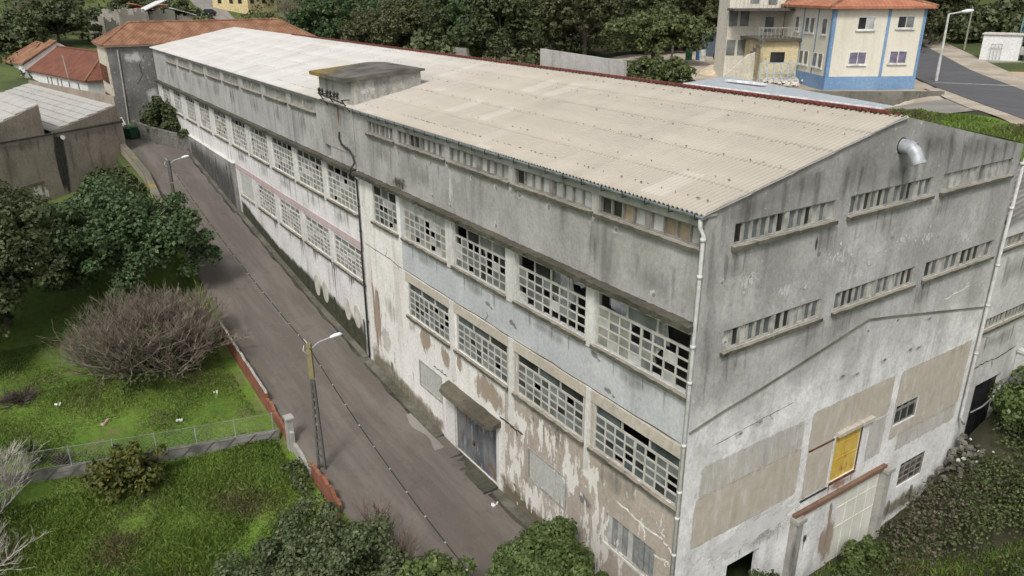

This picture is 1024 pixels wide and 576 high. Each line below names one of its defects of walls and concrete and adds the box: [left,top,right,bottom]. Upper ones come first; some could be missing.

peeling [419,329,462,371]
peeling [472,375,619,574]
crack [617,501,672,568]